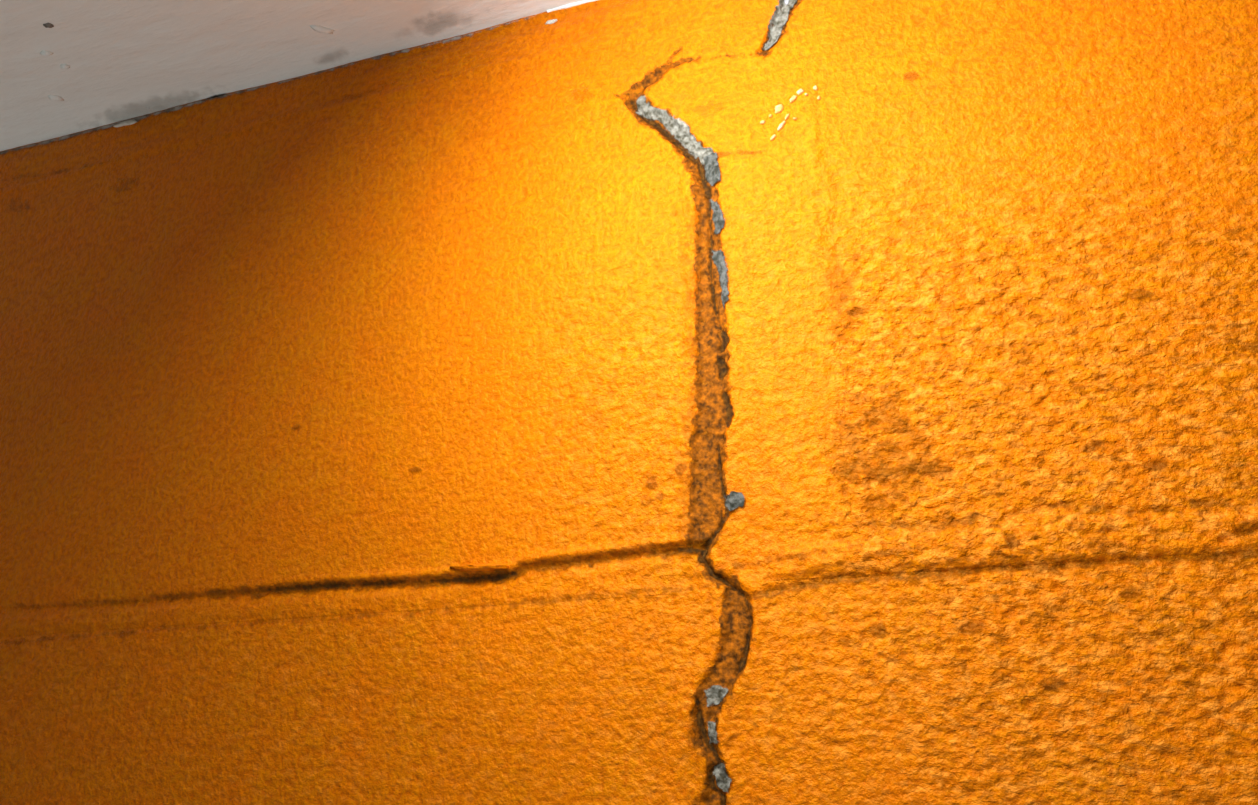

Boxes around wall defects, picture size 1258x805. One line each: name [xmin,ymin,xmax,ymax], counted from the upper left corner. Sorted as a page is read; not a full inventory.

crack [757,0,802,56]
crack [146,47,1159,805]
corrosion [1083,439,1100,450]
corrosion [1142,459,1166,470]
crack [1171,525,1258,560]
corrosion [870,623,886,637]
corrosion [960,620,983,633]